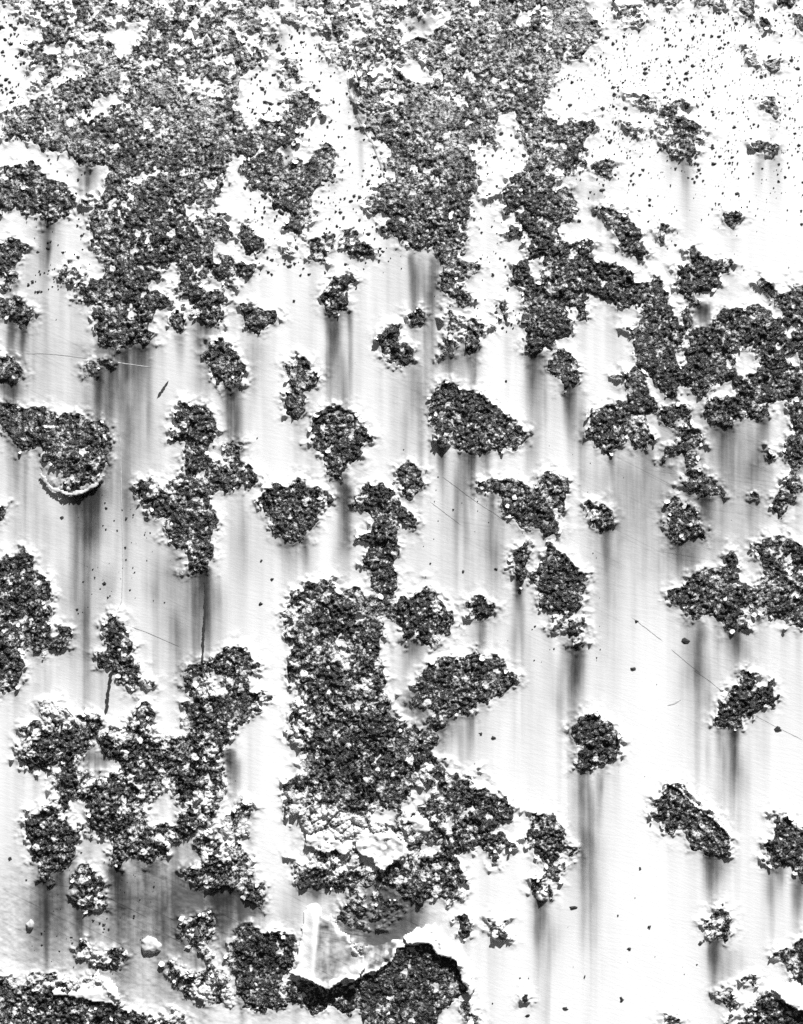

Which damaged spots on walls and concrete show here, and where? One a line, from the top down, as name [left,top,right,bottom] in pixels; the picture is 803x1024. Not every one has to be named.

peeling [664,780,731,837]
peeling [305,812,430,871]
peeling [289,903,475,995]